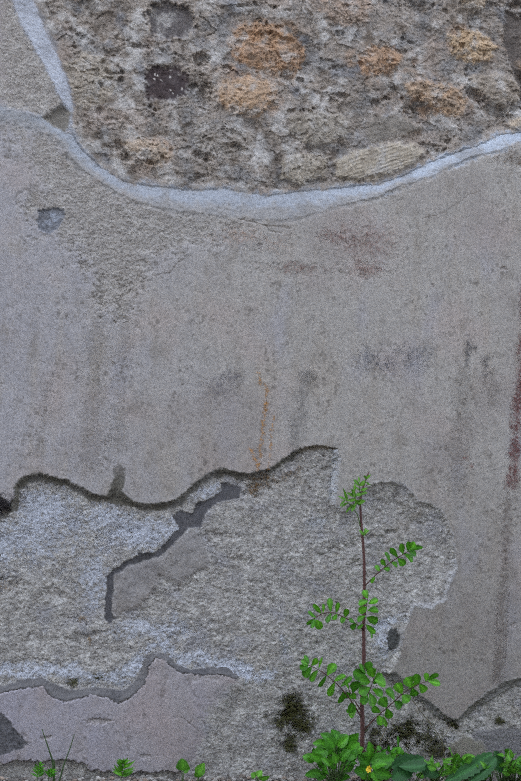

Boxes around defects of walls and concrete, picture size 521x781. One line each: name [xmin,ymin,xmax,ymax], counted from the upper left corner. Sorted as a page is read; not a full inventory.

spalling [34,0,521,196]
peeling [1,121,260,325]
spalling [0,444,521,780]